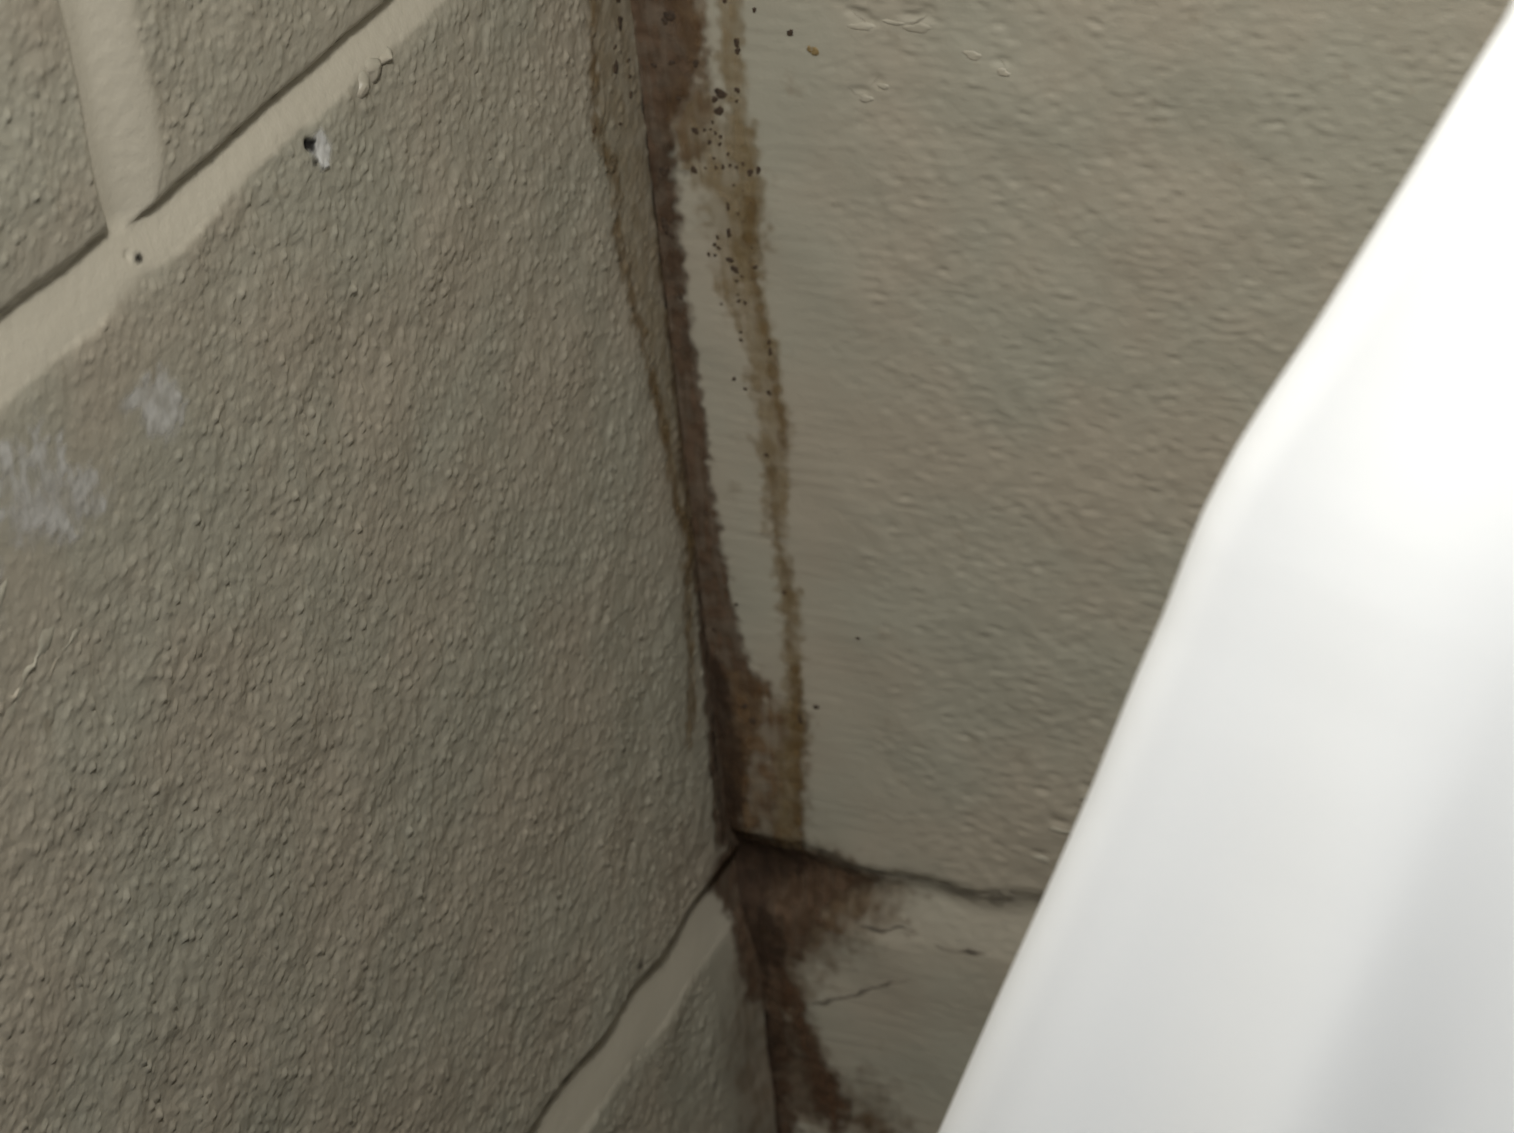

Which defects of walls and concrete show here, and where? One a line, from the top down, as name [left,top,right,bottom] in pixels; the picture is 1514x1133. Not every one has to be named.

damp [590,0,633,99]
damp [650,0,798,622]
damp [725,650,820,857]